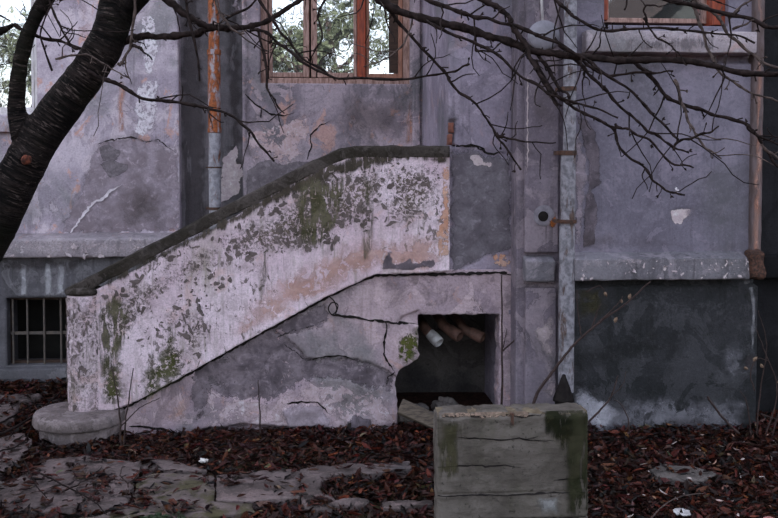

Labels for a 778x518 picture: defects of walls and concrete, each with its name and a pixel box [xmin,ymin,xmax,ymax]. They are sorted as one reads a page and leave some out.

flaking render [6,16,179,260]
crack [70,184,122,233]
peeling [221,115,310,202]
flaking render [446,123,511,271]
flaking render [671,209,691,224]
flaking render [65,160,441,429]
crack [123,271,511,433]
leakage [577,393,744,431]